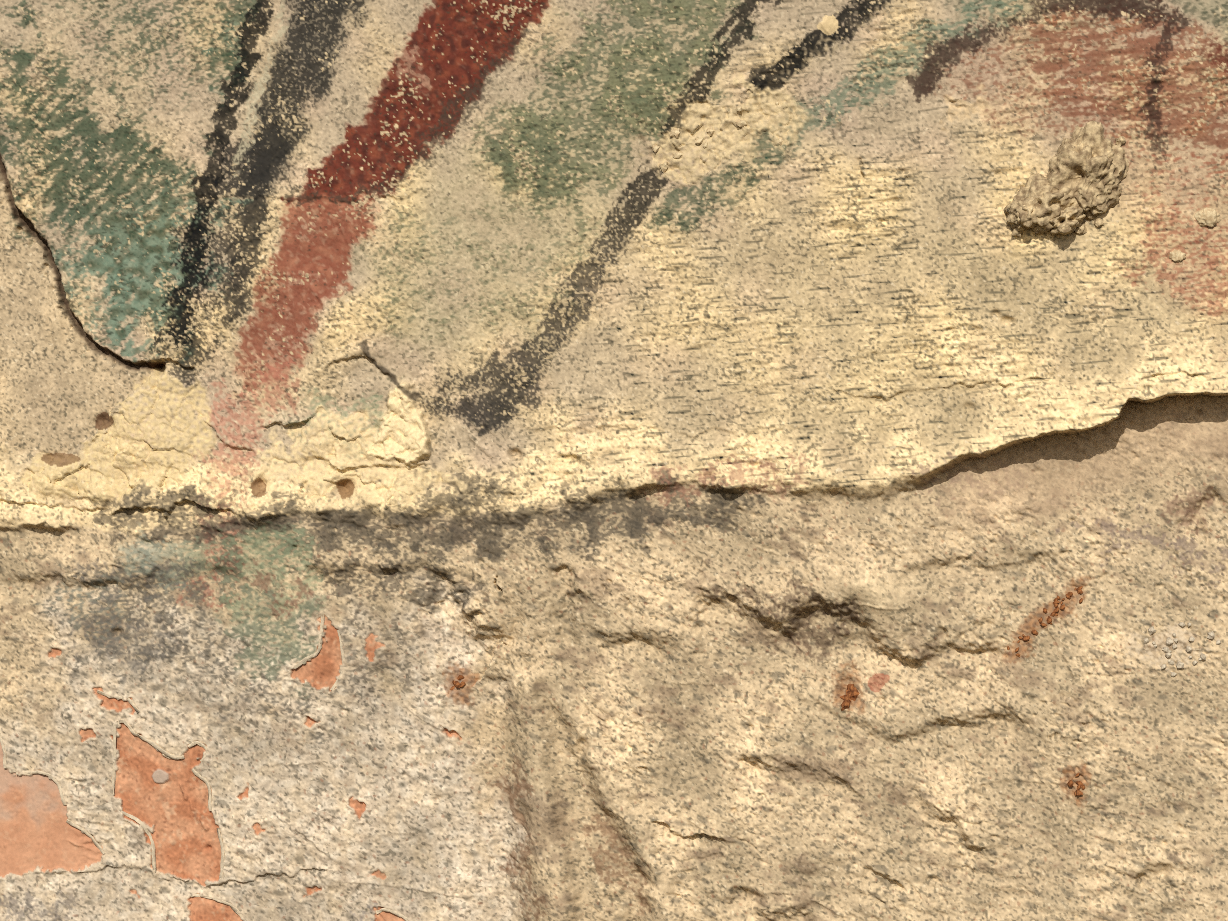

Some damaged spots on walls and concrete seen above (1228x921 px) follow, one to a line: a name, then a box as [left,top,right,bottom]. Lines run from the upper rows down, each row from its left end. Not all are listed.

crack [0,152,172,374]
crack [794,377,1083,405]
peeling [292,614,345,692]
rust [996,573,1098,670]
peeling [80,729,96,743]
peeling [0,733,105,878]
peeling [93,687,246,921]
peeling [374,907,412,921]